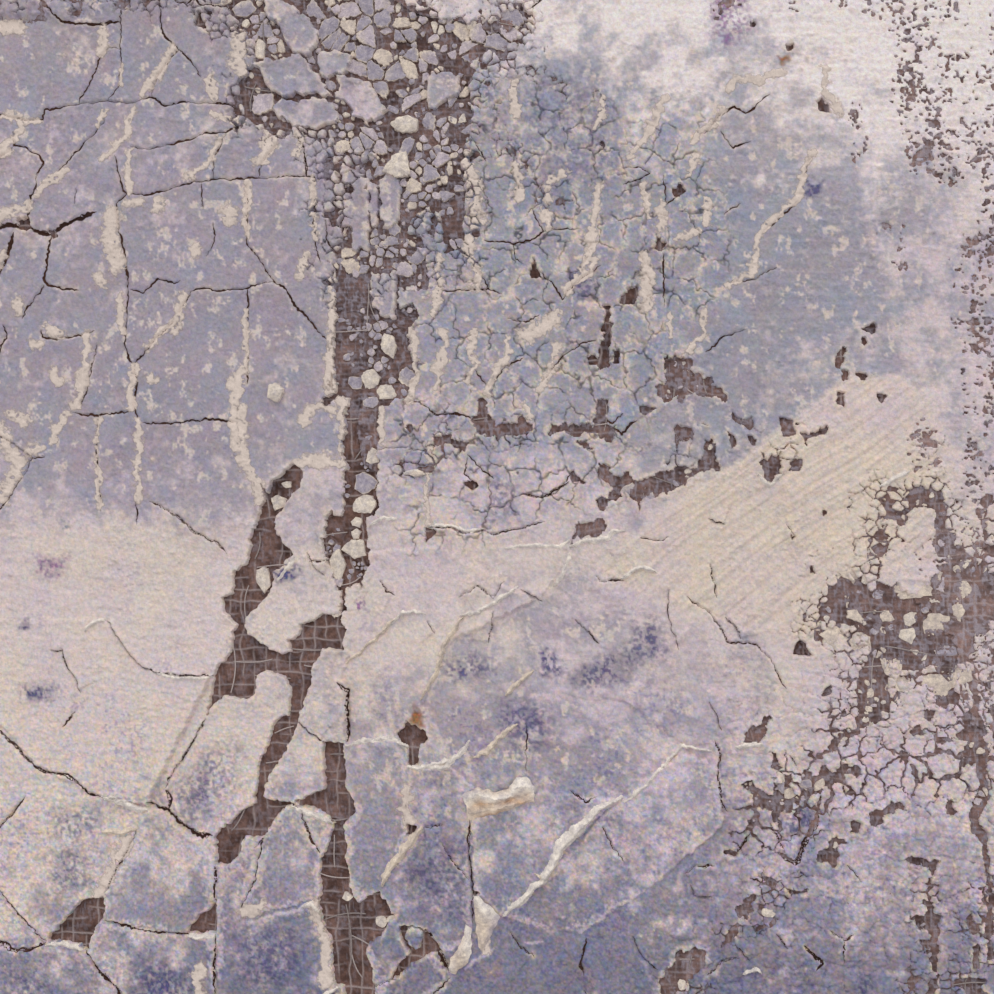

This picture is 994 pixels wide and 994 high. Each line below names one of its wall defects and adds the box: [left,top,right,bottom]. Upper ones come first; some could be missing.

crack [0,0,336,464]
spalling [587,287,638,370]
peeling [639,355,727,415]
spalling [190,0,570,994]
peeling [571,424,720,544]
peeling [730,0,994,994]
crack [667,567,787,689]
crack [0,730,100,797]
crack [146,720,213,839]
crack [337,683,350,741]
crack [0,892,46,952]
spalling [51,897,105,948]